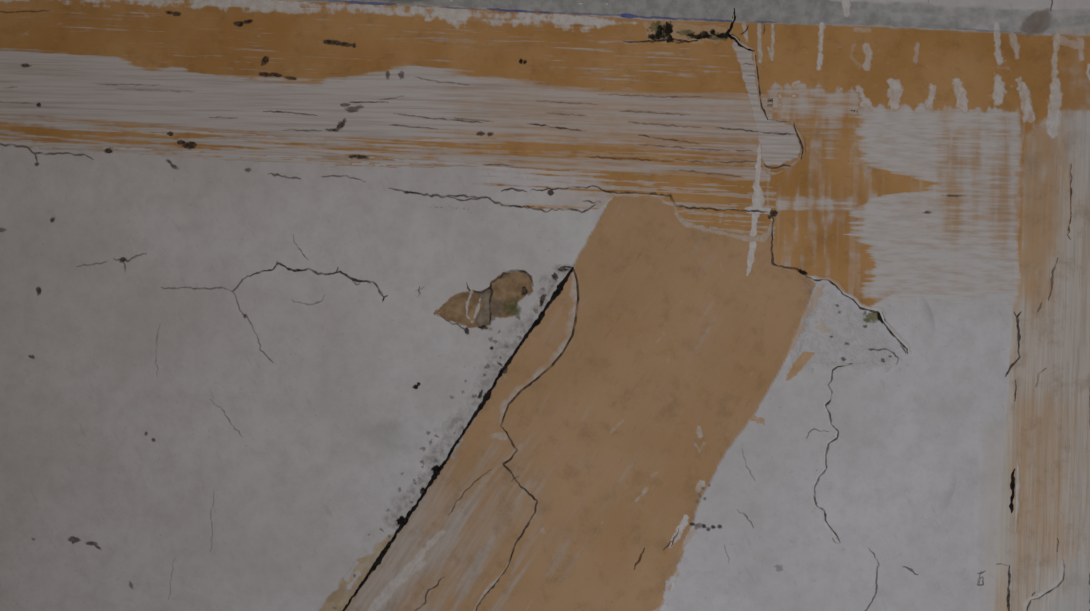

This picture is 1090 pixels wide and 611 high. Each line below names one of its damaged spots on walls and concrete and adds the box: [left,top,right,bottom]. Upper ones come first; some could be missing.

crack [161,263,388,361]
peeling [0,0,1090,378]
crack [391,186,911,354]
crack [1005,163,1072,402]
spalling [317,263,576,611]
crack [343,266,579,611]
crack [634,533,678,569]
peeling [668,514,722,548]
crack [806,363,853,543]
crack [865,551,918,611]
crack [1009,459,1022,533]
crack [1006,538,1090,611]